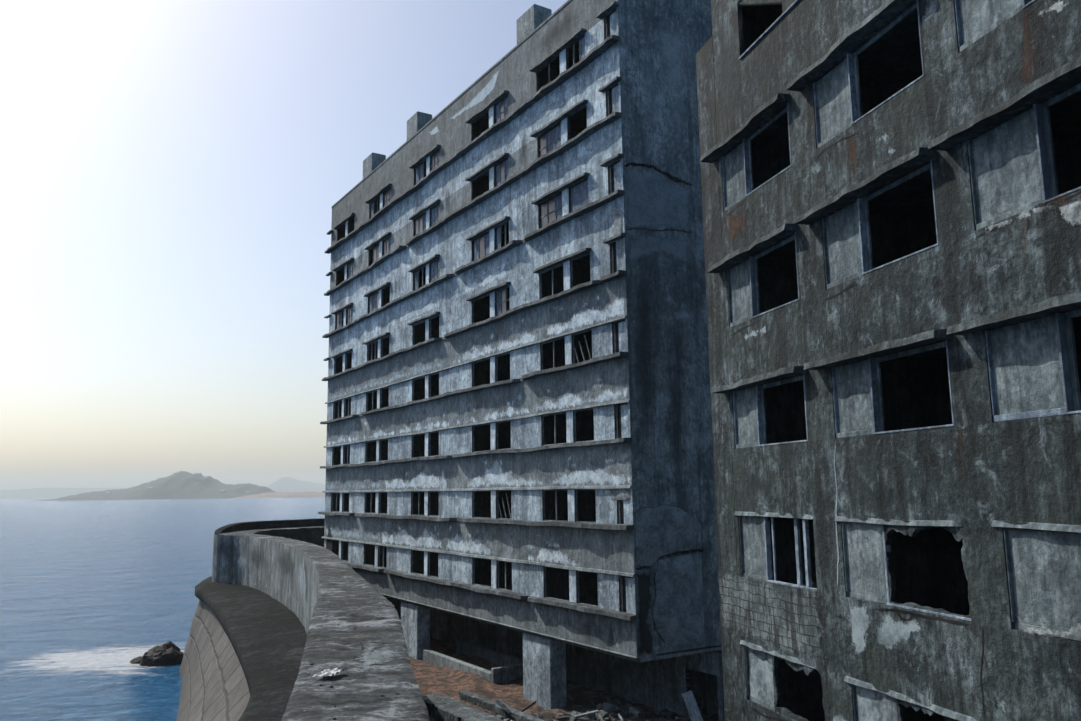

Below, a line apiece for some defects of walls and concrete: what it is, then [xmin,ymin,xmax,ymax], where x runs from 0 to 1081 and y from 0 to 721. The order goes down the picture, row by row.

crack [623,162,692,185]
crack [626,226,692,234]
spalling [985,199,1081,232]
crack [636,549,704,643]
peeling [850,524,971,654]